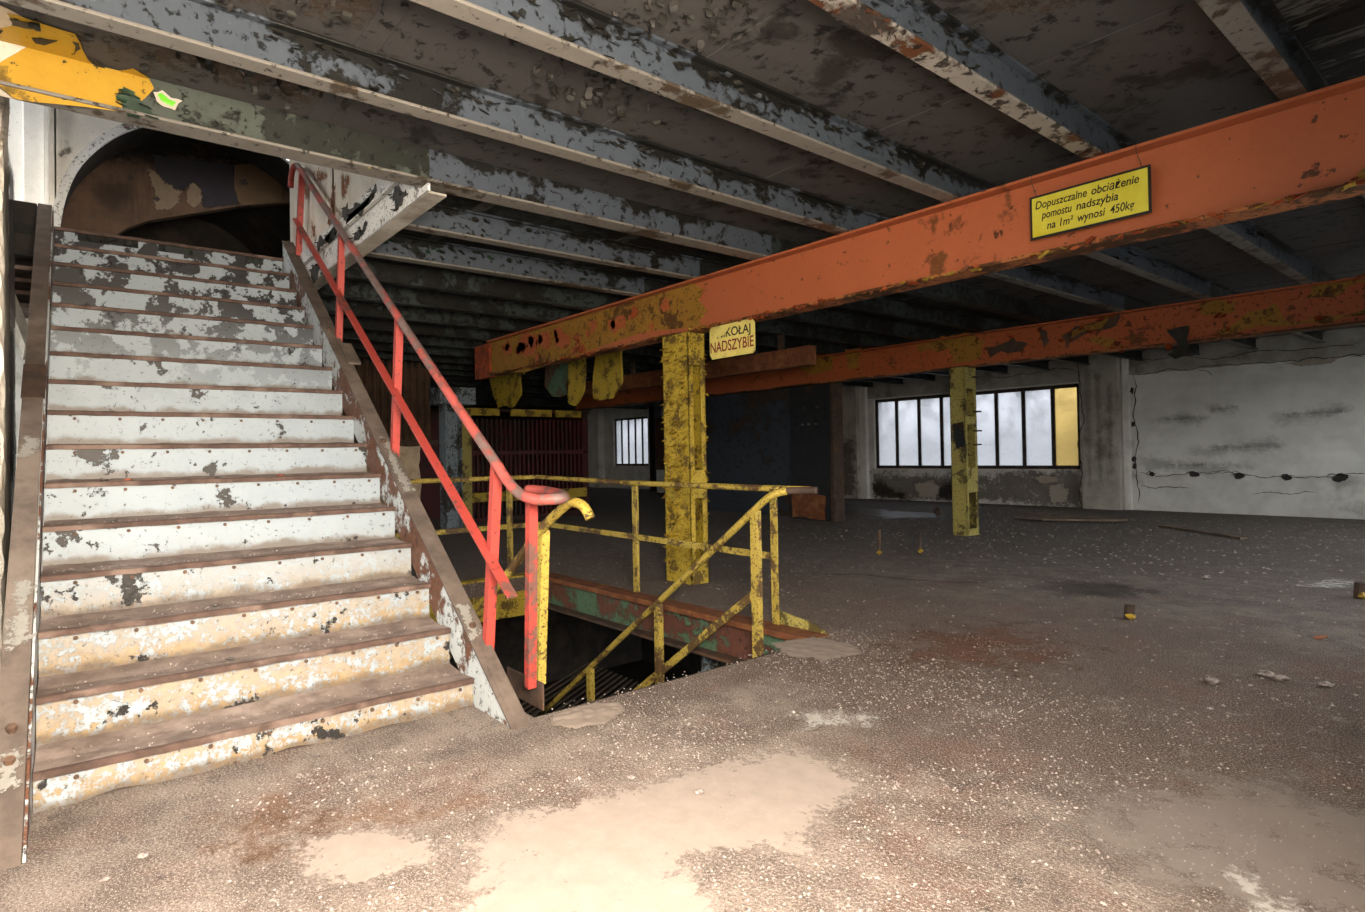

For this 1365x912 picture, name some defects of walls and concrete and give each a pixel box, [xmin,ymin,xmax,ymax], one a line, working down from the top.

peeling [0,18,106,69]
peeling [115,87,182,119]
peeling [175,51,219,83]
peeling [234,0,412,111]
peeling [508,0,541,19]
peeling [533,57,661,167]
peeling [557,0,951,176]
corrosion [830,6,906,41]
peeling [884,0,991,69]
peeling [146,154,283,211]
peeling [308,184,408,283]
peeling [379,435,416,494]